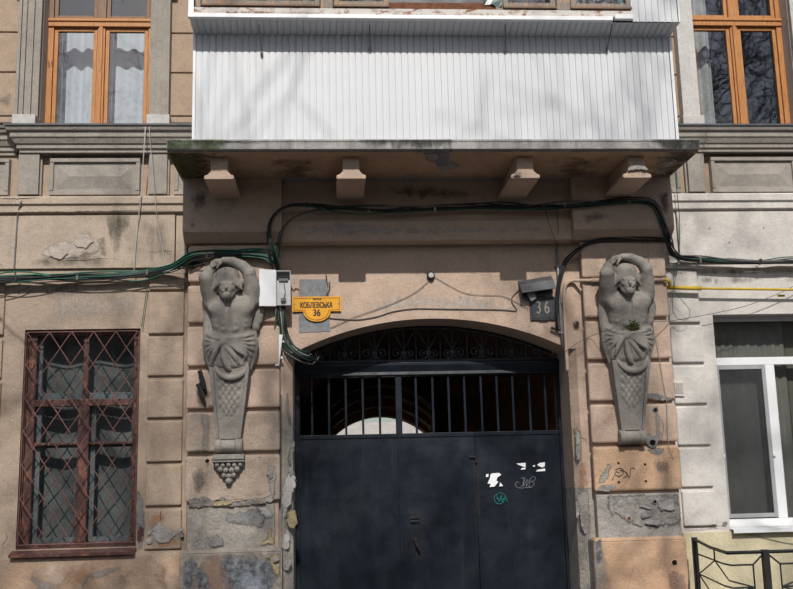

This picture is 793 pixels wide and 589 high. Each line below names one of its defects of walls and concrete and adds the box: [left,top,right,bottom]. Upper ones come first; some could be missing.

peeling [43,232,100,262]
spalling [137,521,184,544]
spalling [189,465,298,577]
peeling [575,490,591,534]
damp [580,467,608,589]
flaking render [598,480,681,529]